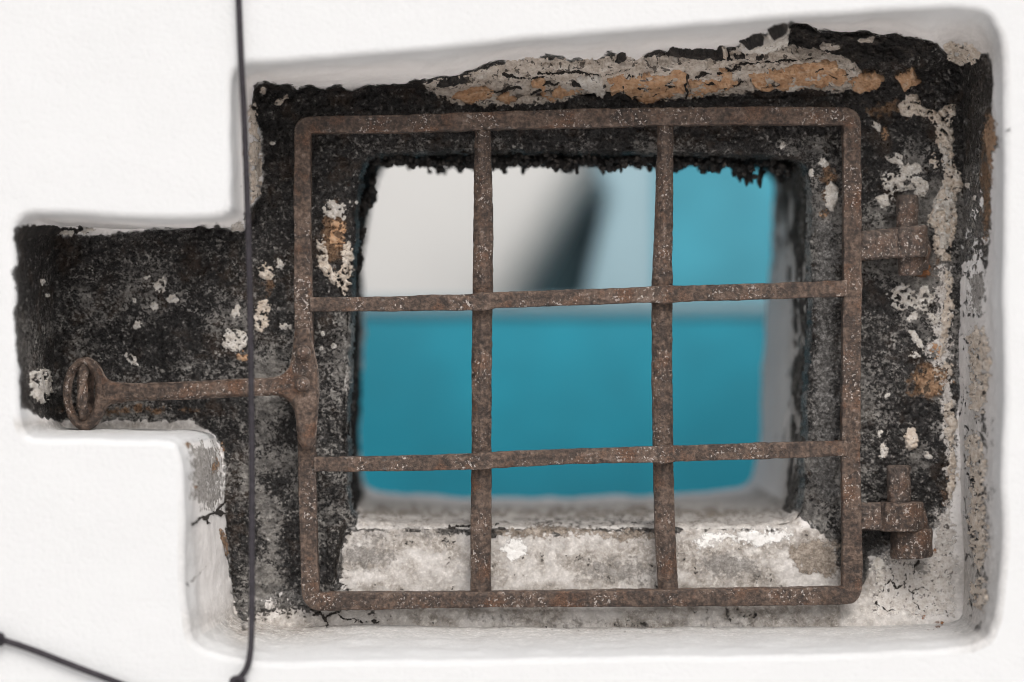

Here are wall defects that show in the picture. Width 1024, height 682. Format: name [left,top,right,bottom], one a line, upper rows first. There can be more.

spalling [316,199,358,296]
damp [809,216,842,281]
spalling [423,23,998,621]
damp [808,297,841,441]
spalling [185,440,226,512]
crack [191,502,236,595]
damp [342,529,397,569]
damp [491,503,655,543]
damp [703,555,761,577]
damp [789,539,840,578]